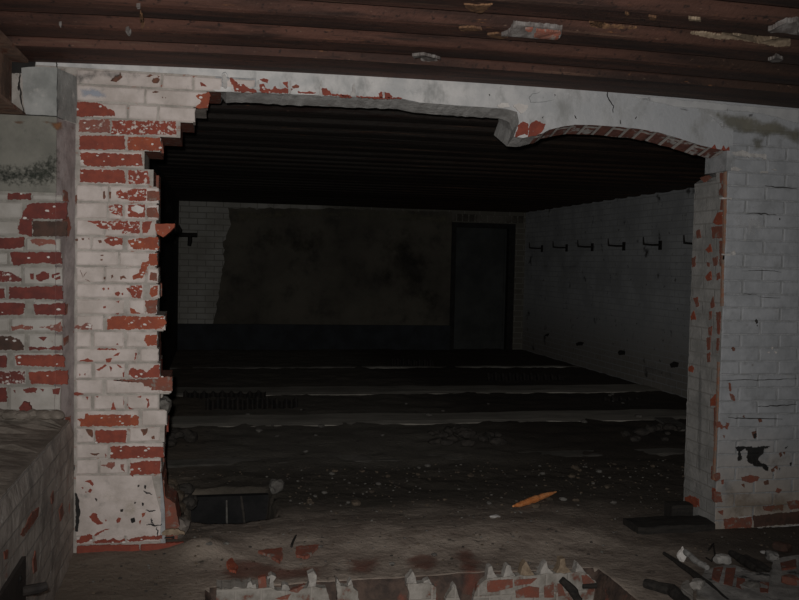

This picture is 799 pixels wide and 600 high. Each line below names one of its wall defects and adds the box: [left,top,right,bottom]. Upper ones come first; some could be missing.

peeling [501,20,562,40]
crack [16,72,24,112]
peeling [229,77,402,100]
spalling [515,120,546,138]
leakage [0,162,55,183]
peeling [0,101,177,411]
spalling [700,171,799,529]
crack [728,404,797,419]
peeling [65,400,164,477]
peeling [76,513,184,554]